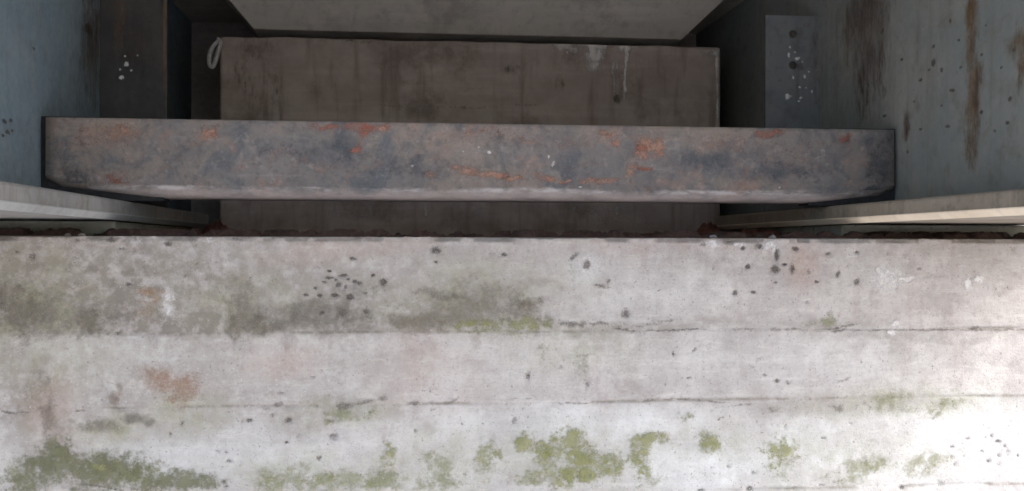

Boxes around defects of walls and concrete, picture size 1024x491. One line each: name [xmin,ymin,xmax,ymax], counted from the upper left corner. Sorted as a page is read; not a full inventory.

damp [554,44,631,102]
corrosion [958,0,987,159]